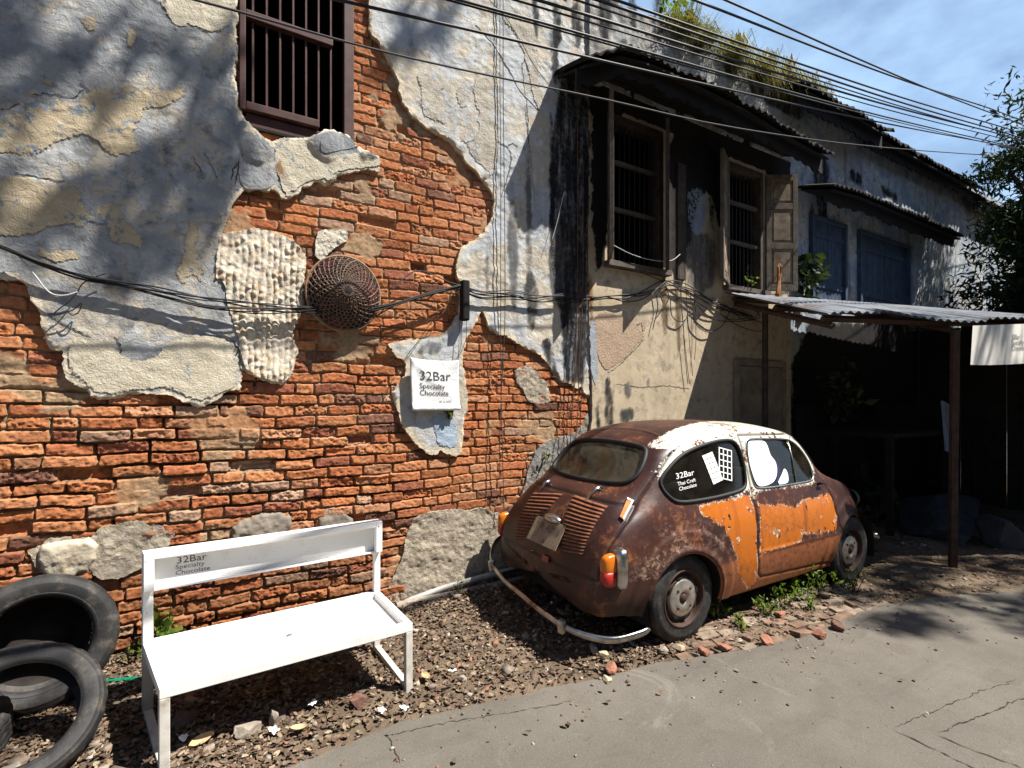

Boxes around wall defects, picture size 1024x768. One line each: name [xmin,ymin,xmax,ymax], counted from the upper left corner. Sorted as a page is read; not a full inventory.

flaking render [0,0,646,653]
crack [499,60,547,208]
damp [533,0,791,383]
crack [897,680,1024,768]